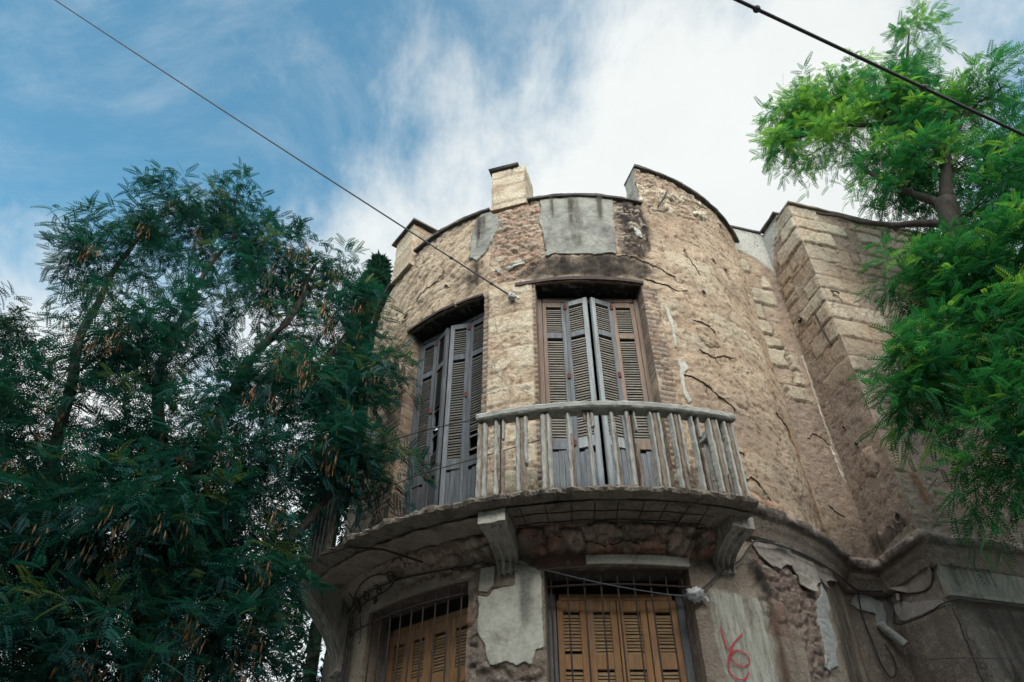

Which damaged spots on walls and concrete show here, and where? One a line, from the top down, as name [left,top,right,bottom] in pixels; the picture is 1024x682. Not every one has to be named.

crack [618,247,701,292]
crack [684,319,736,410]
flaking render [368,502,717,682]
flaking render [748,540,839,682]
flaking render [851,562,946,638]